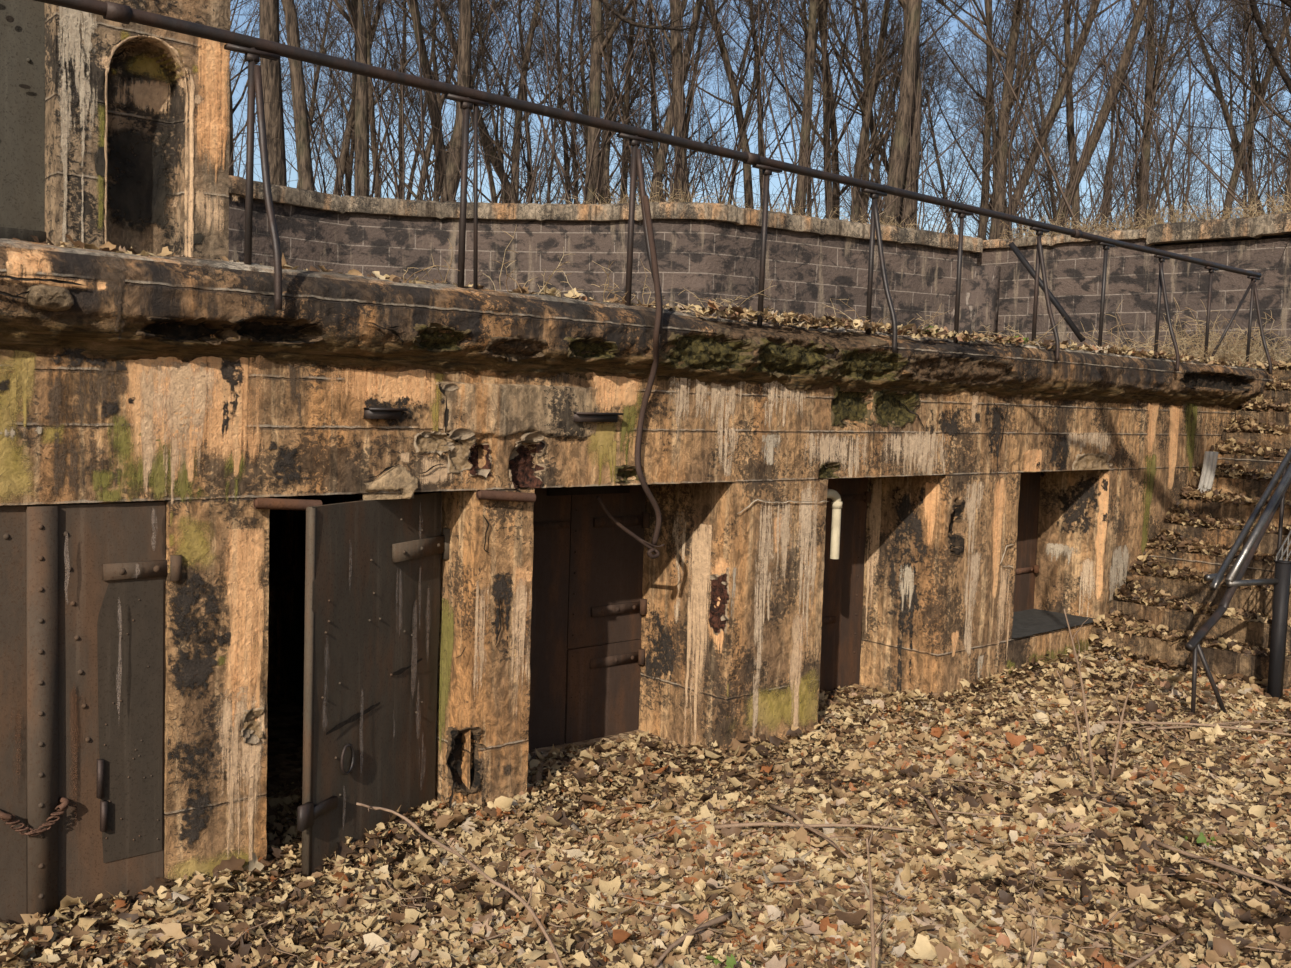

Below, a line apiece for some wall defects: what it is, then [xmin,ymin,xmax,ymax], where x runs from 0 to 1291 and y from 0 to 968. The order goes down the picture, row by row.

damp [57,6,237,340]
damp [0,348,244,505]
spalling [414,428,492,478]
spalling [508,432,547,489]
damp [473,572,531,697]
damp [644,511,712,746]
corrosion [708,594,724,653]
corrosion [712,558,729,575]
damp [752,483,818,735]
damp [805,392,1012,693]
damp [1046,475,1129,617]
damp [167,686,264,861]